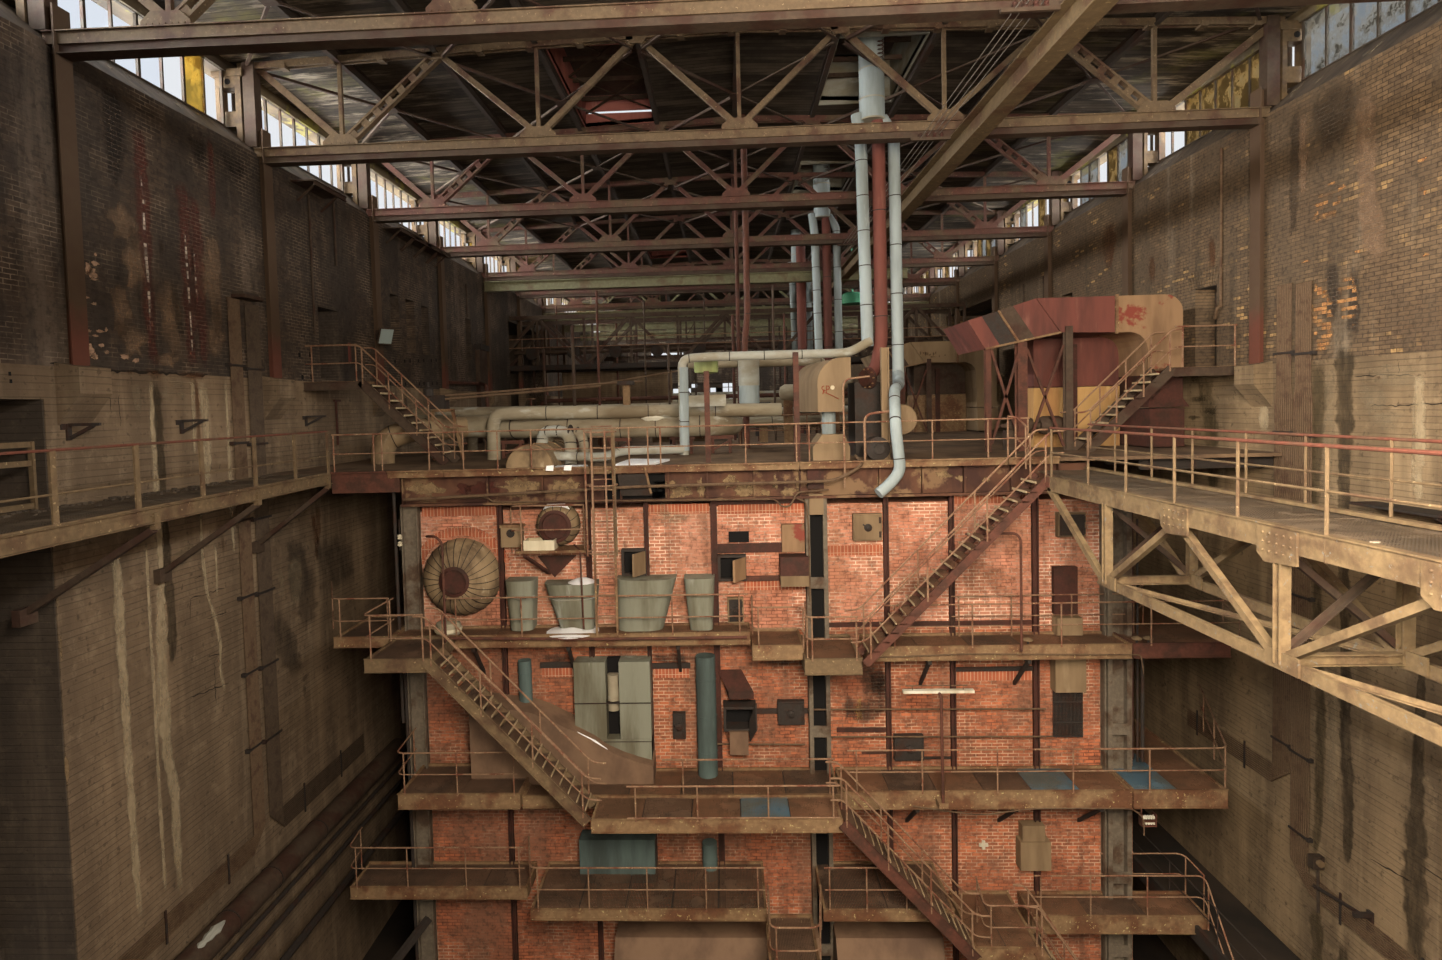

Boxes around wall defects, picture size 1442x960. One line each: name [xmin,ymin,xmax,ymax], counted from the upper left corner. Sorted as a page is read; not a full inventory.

peeling [85,252,100,305]
flaking render [88,205,145,363]
damp [150,388,166,492]
damp [1312,350,1354,509]
damp [114,559,140,894]
damp [146,521,181,882]
damp [1314,690,1354,861]
damp [1338,567,1350,590]
damp [1340,608,1348,630]
damp [1341,647,1351,679]
damp [1403,734,1428,960]
damp [1415,675,1426,718]